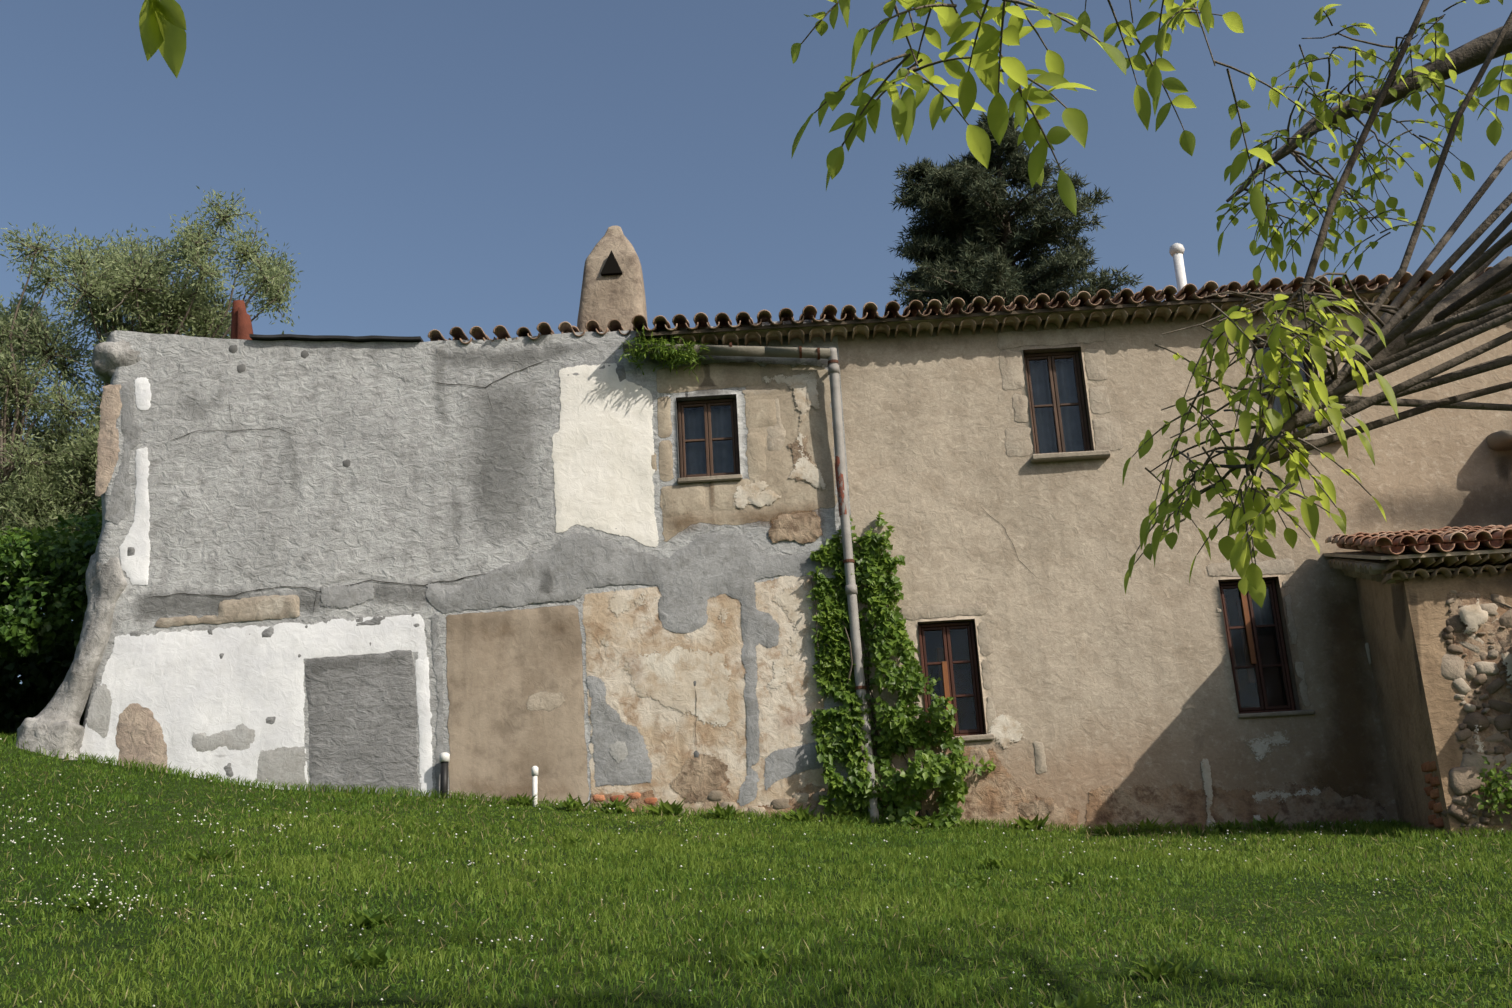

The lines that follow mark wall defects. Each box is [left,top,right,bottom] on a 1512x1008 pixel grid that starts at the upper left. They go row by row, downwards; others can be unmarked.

peeling [762,370,828,490]
spalling [733,479,823,544]
peeling [80,613,433,796]
peeling [526,690,566,711]
peeling [582,575,839,821]